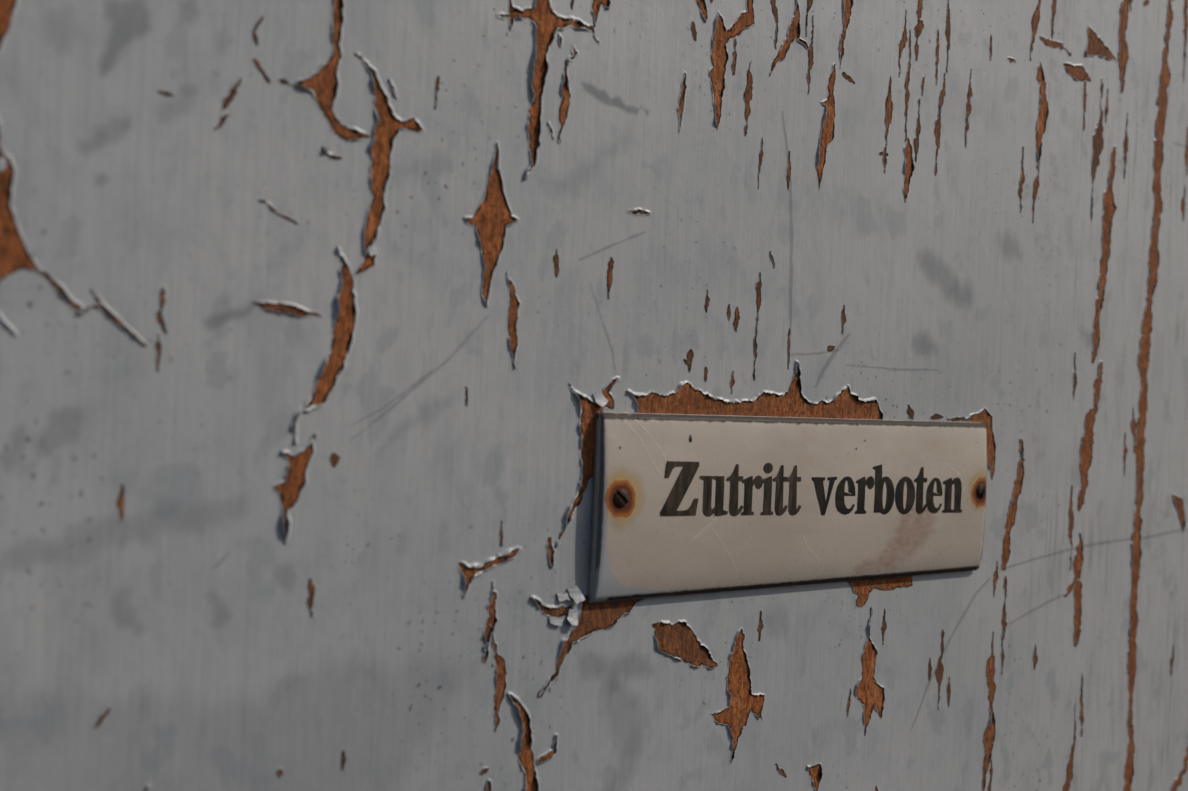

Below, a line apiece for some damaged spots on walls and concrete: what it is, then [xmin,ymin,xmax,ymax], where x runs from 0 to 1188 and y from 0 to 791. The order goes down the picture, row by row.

peeling [493,0,611,182]
peeling [695,0,756,131]
peeling [0,120,148,348]
peeling [251,0,426,546]
peeling [462,140,522,370]
peeling [545,359,884,569]
peeling [965,407,996,480]
peeling [457,545,524,601]
peeling [506,691,558,791]
peeling [529,585,645,698]
peeling [651,619,765,764]
peeling [845,576,913,737]